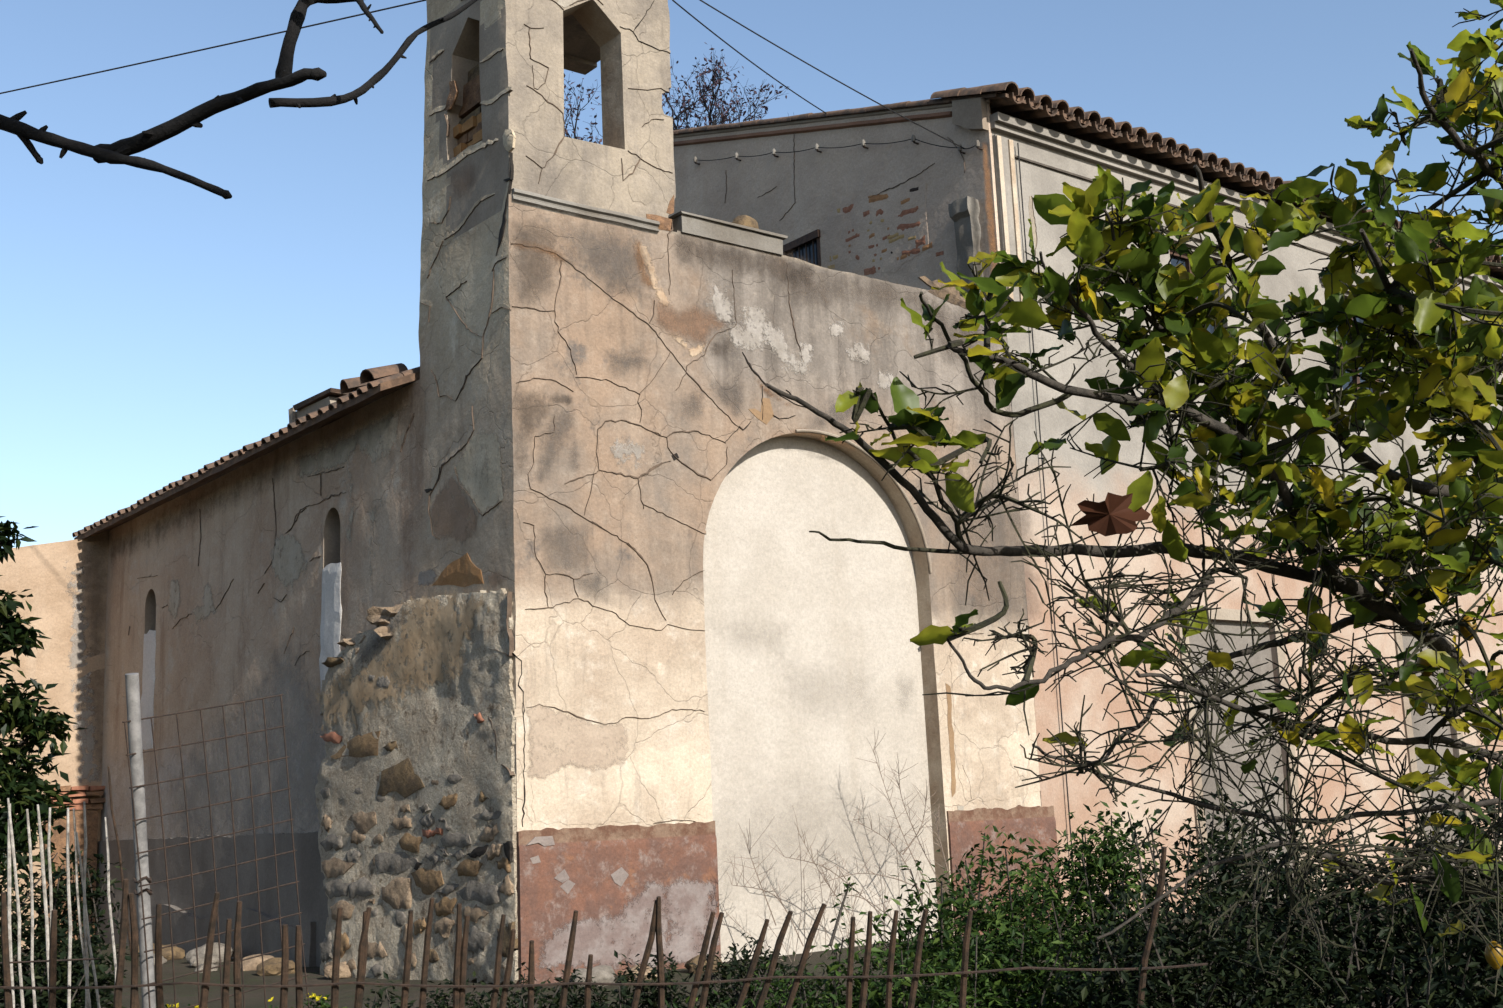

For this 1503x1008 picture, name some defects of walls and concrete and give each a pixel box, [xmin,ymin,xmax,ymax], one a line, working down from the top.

crack [870,137,965,198]
spalling [827,181,944,276]
spalling [918,276,967,309]
crack [400,0,804,827]
peeling [455,432,504,515]
crack [137,467,346,666]
spalling [315,553,628,985]
peeling [539,867,720,969]